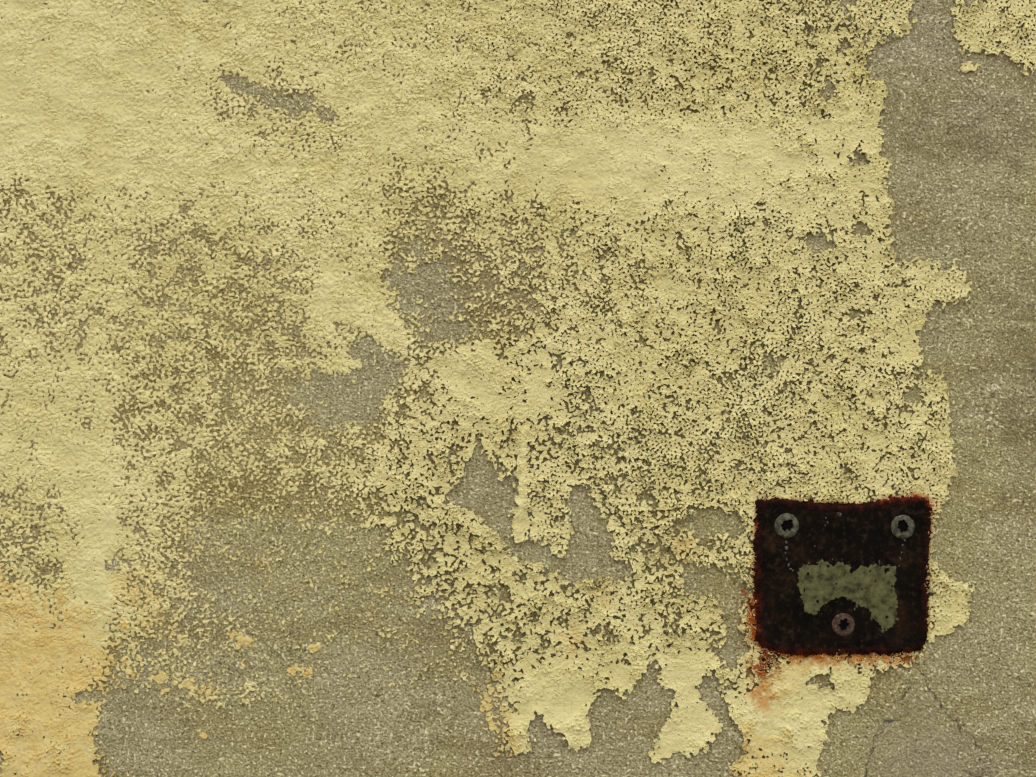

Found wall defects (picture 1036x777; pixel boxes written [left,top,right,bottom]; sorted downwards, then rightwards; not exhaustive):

peeling [849,147,876,170]
peeling [304,221,328,247]
peeling [490,285,522,315]
peeling [230,383,256,411]
peeling [255,402,281,433]
peeling [261,426,321,515]
peeling [216,481,242,508]
peeling [242,481,299,515]
peeling [349,501,367,521]
corrosion [741,494,934,677]